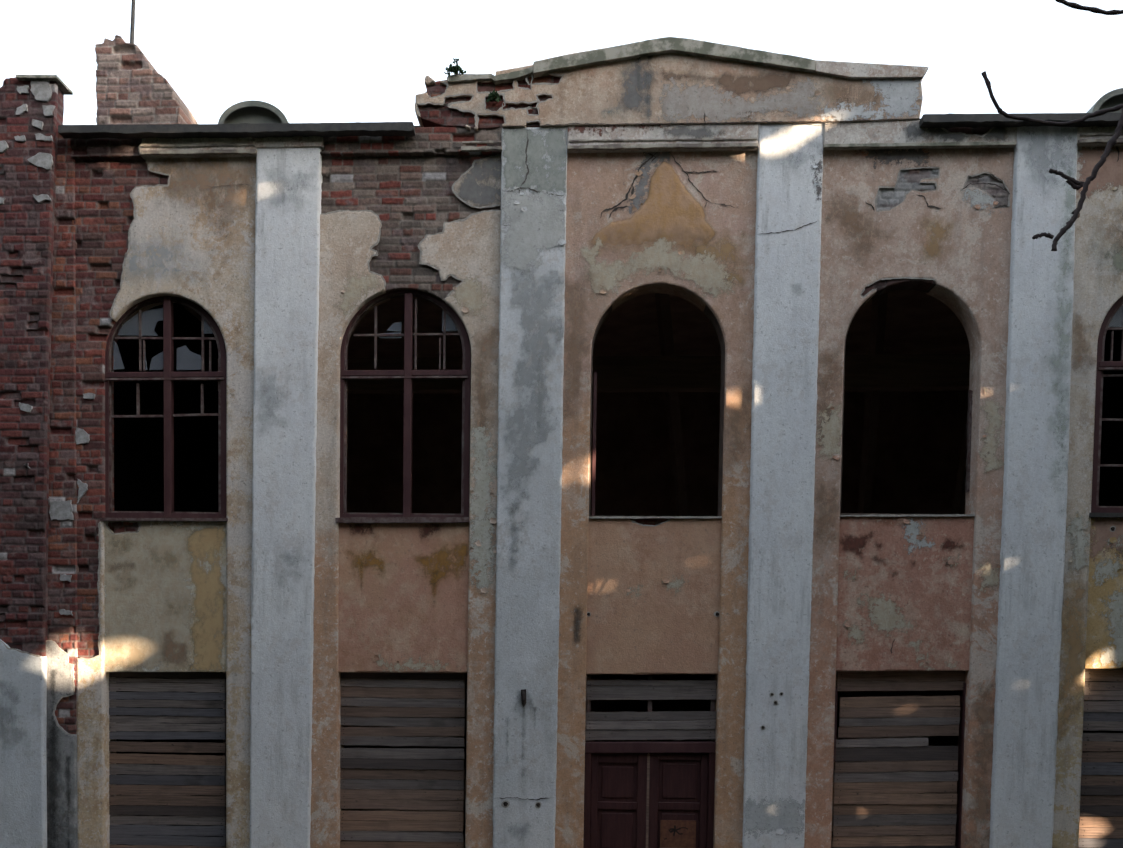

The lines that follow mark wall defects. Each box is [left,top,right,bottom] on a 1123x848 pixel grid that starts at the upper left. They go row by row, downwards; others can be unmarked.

spalling [320,72,566,303]
peeling [623,152,673,214]
crack [504,113,904,218]
spalling [857,149,940,212]
spalling [961,172,1010,216]
peeling [1076,146,1123,203]
peeling [580,237,735,301]
spalling [0,77,226,735]
leakage [506,270,587,513]
peeling [896,518,935,555]
peeling [1066,512,1123,668]